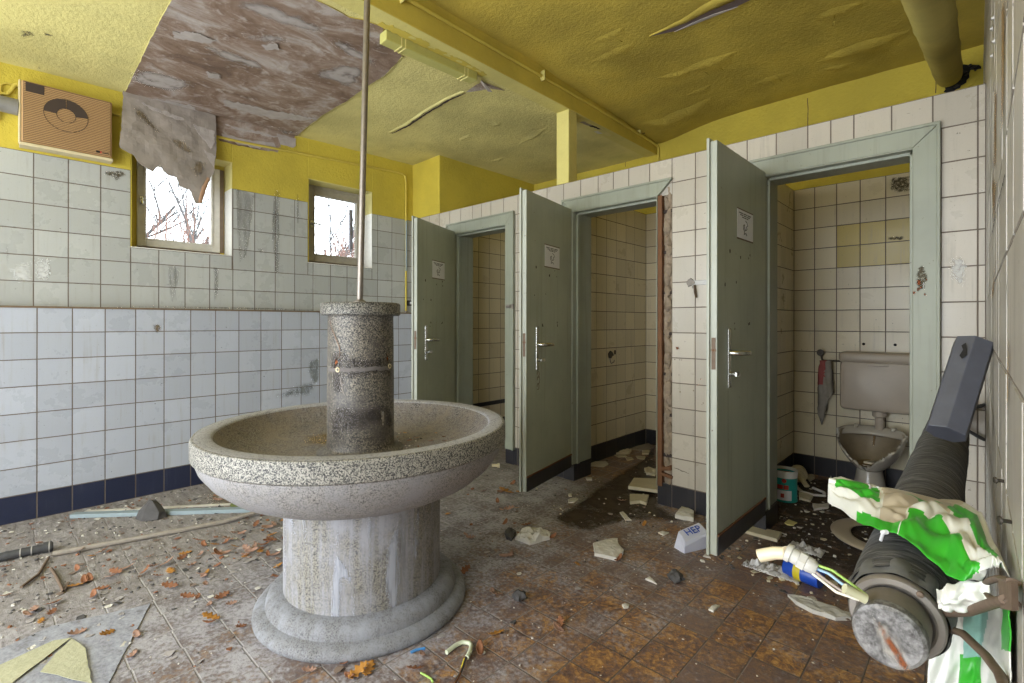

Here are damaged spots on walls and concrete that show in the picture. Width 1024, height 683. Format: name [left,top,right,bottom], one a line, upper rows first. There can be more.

peeling [119,0,487,204]
spalling [661,187,673,485]
rust [913,267,927,296]
water stain [558,452,680,529]